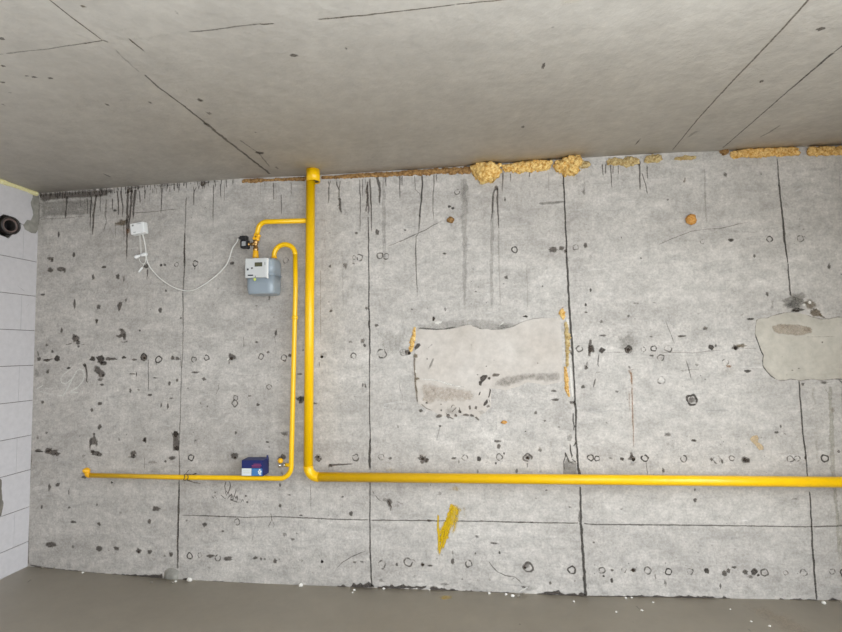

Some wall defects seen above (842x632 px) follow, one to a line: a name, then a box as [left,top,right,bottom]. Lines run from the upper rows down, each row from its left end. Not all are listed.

damp [40,181,233,257]
damp [359,177,386,228]